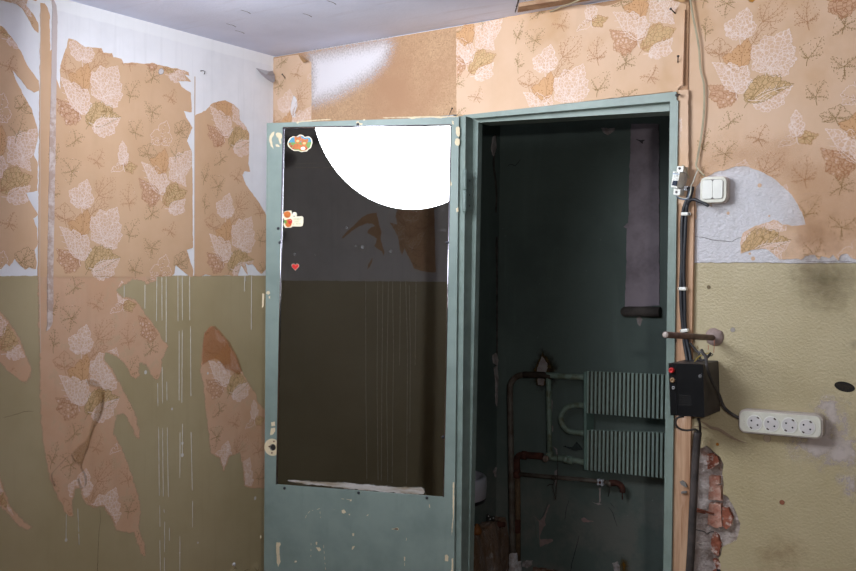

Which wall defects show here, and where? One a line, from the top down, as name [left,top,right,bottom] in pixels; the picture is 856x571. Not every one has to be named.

peeling [256,68,275,83]
leakage [179,277,191,387]
spalling [694,443,741,571]